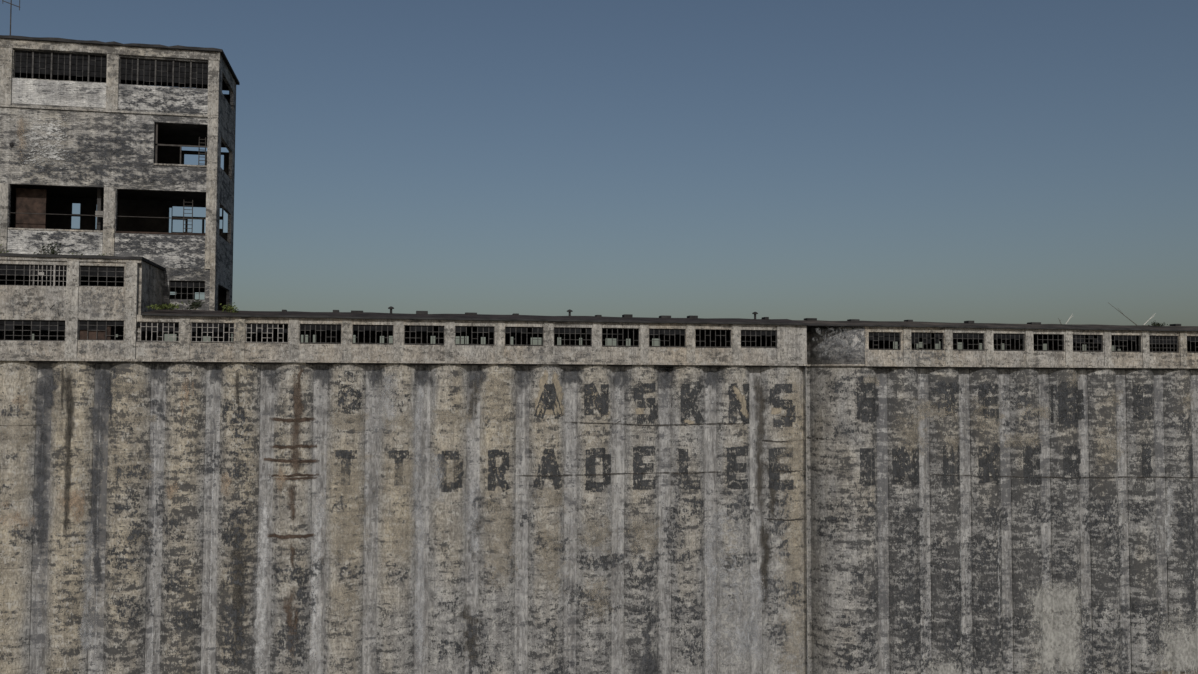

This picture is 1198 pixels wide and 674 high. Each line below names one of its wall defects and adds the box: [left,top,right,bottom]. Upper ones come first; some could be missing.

damp [32,368,74,554]
damp [88,363,116,611]
corrosion [264,444,319,480]